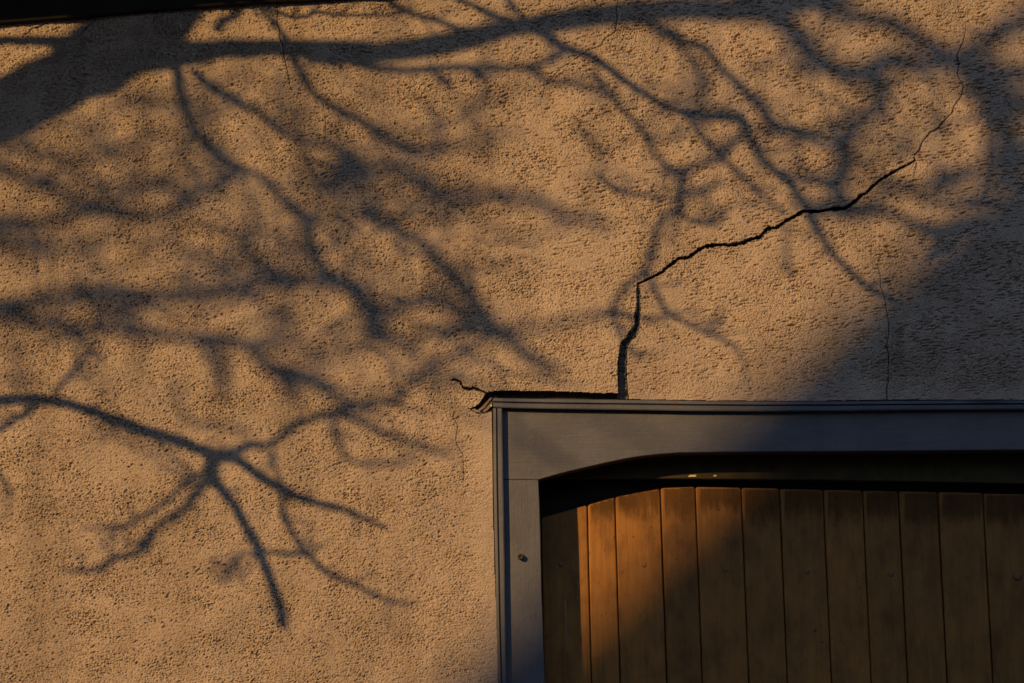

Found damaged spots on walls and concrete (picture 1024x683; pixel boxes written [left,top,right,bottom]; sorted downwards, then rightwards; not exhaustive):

crack [617,23,966,400]
crack [451,379,488,481]